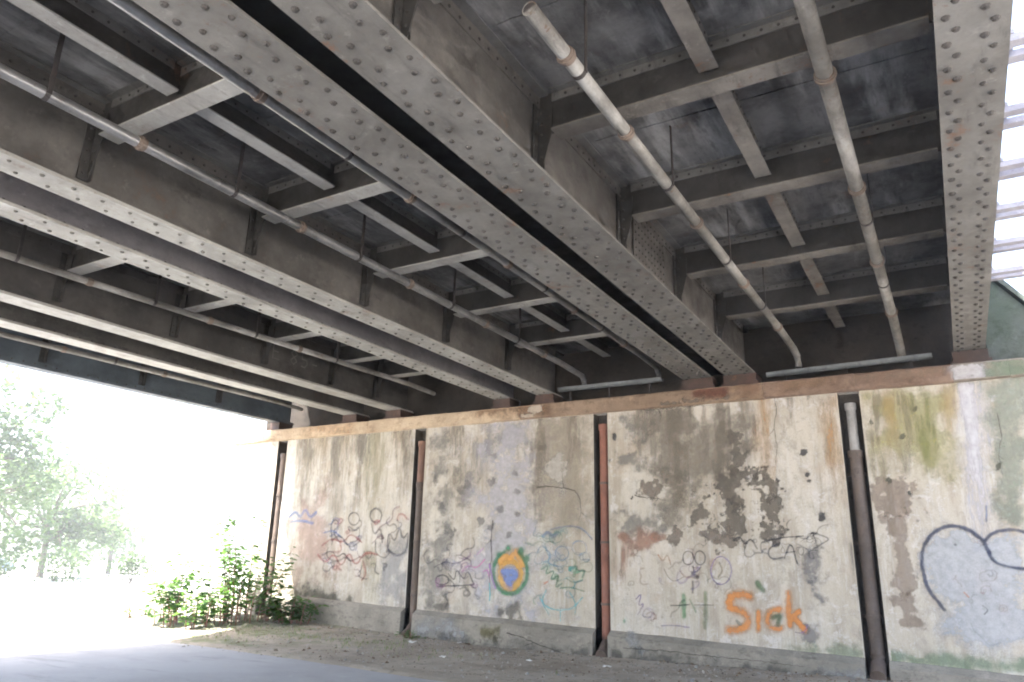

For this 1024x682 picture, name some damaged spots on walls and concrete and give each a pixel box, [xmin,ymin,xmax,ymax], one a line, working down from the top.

rust [693,384,768,434]
rust [781,380,824,391]
rust [851,366,944,384]
damp [952,364,991,544]
crack [537,470,585,522]
spalling [631,478,667,500]
peeling [667,430,789,555]